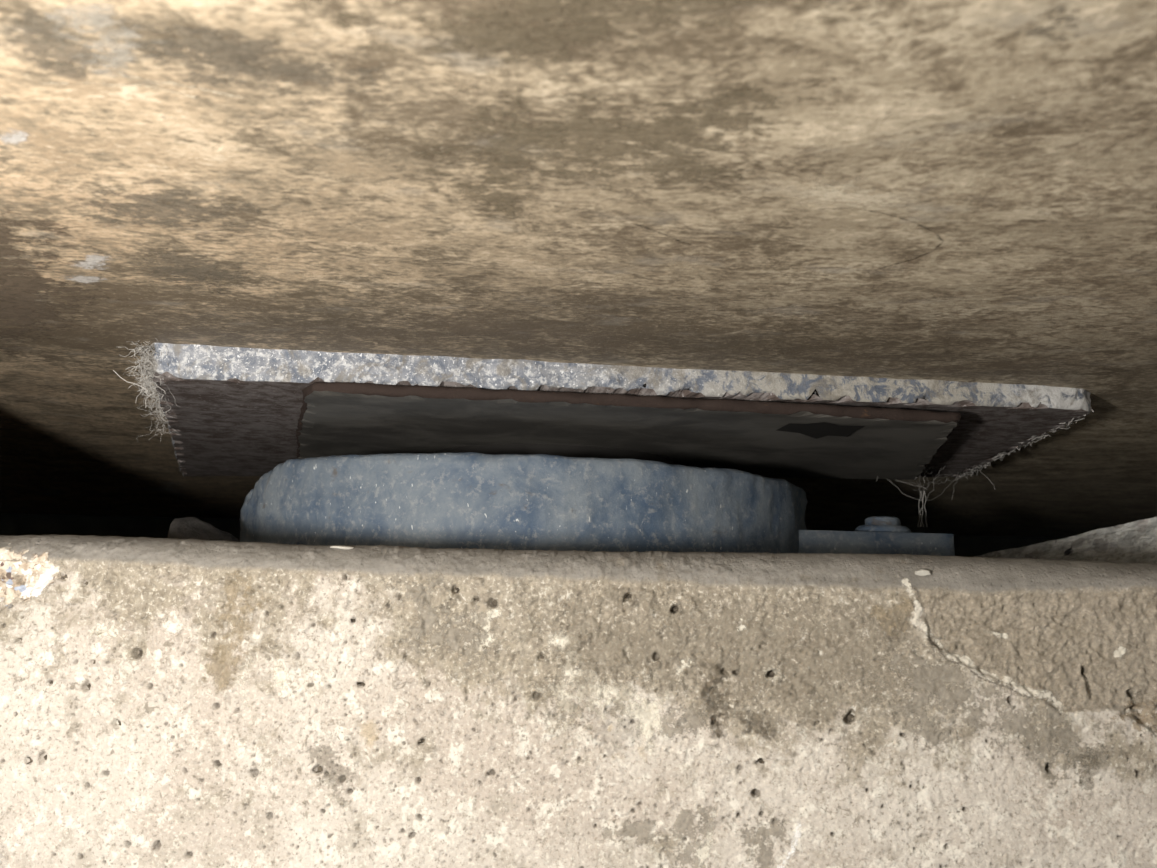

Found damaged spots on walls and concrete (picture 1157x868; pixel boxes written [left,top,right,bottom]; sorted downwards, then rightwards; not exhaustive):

damp [6,3,100,78]
damp [128,17,381,94]
damp [410,0,779,88]
damp [0,131,28,144]
damp [424,87,778,220]
damp [81,181,259,235]
damp [786,177,914,209]
damp [0,211,111,353]
damp [126,250,247,294]
spalling [0,543,68,606]
crack [902,578,1063,715]